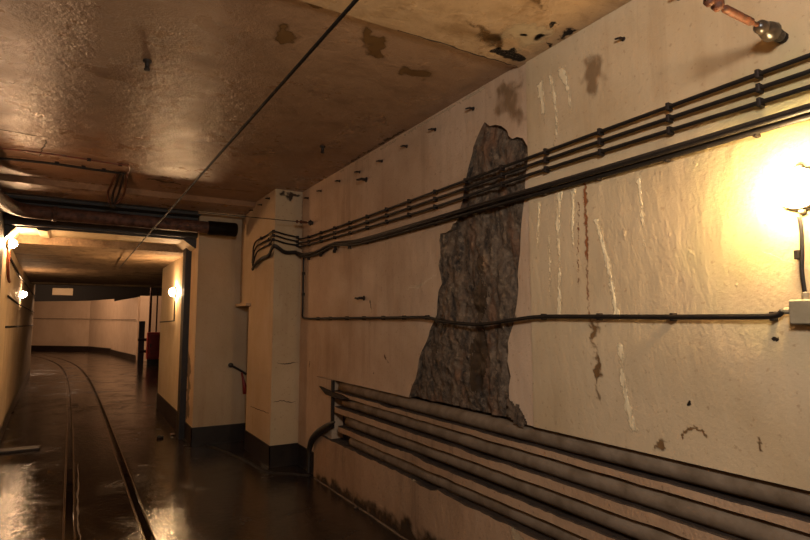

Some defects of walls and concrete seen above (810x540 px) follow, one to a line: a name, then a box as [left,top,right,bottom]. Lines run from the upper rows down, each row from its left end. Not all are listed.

damp [362,27,386,58]
peeling [489,23,554,50]
damp [586,58,601,92]
spalling [414,124,528,428]
damp [317,476,436,540]